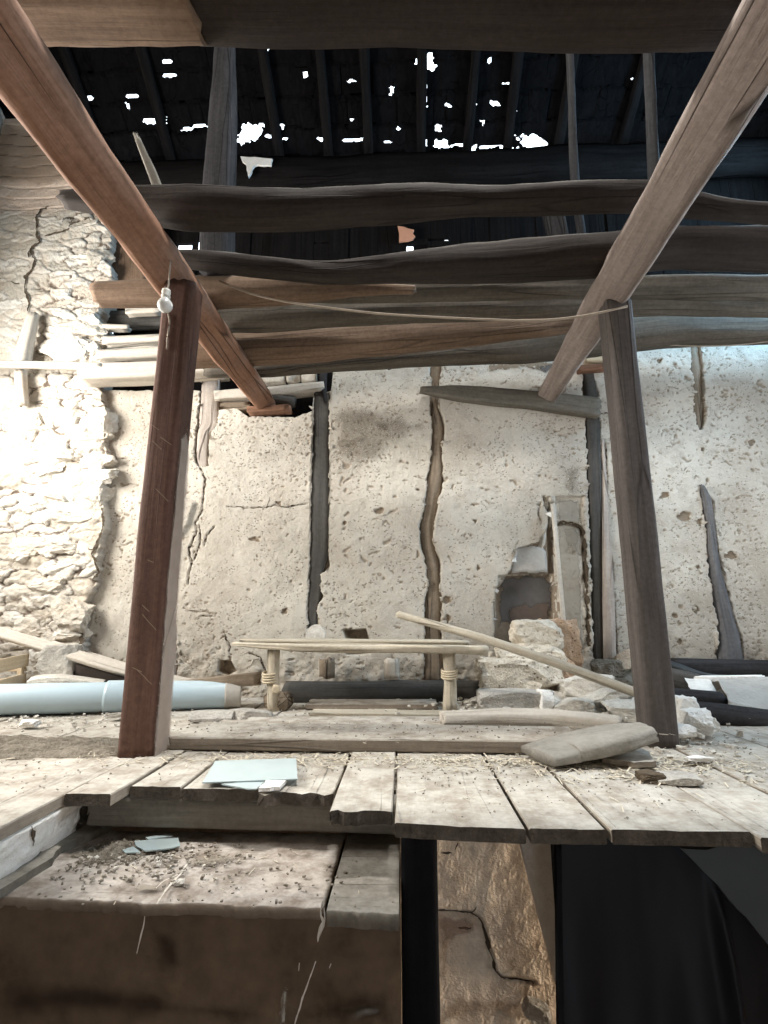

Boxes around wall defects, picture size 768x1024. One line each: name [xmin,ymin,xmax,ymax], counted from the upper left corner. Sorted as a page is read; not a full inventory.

crack [11,206,89,311]
crack [188,468,215,582]
spalling [493,501,603,658]
crack [187,609,266,670]